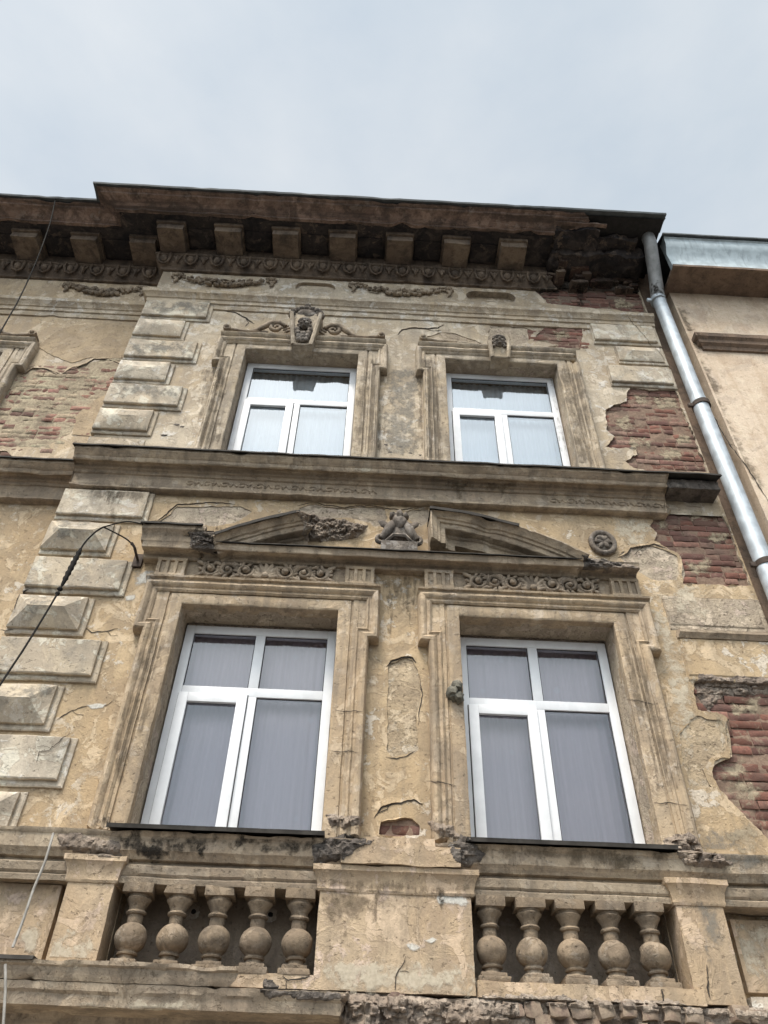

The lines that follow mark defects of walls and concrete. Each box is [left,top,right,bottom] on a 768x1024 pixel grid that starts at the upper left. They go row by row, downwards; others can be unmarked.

flaking render [537,289,645,313]
flaking render [427,326,590,350]
crack [21,357,119,375]
flaking render [0,358,123,456]
flaking render [605,387,706,472]
crack [149,499,235,521]
flaking render [620,511,748,616]
crack [36,700,113,762]
flaking render [679,683,768,859]
crack [373,781,455,818]
flaking render [377,817,420,838]